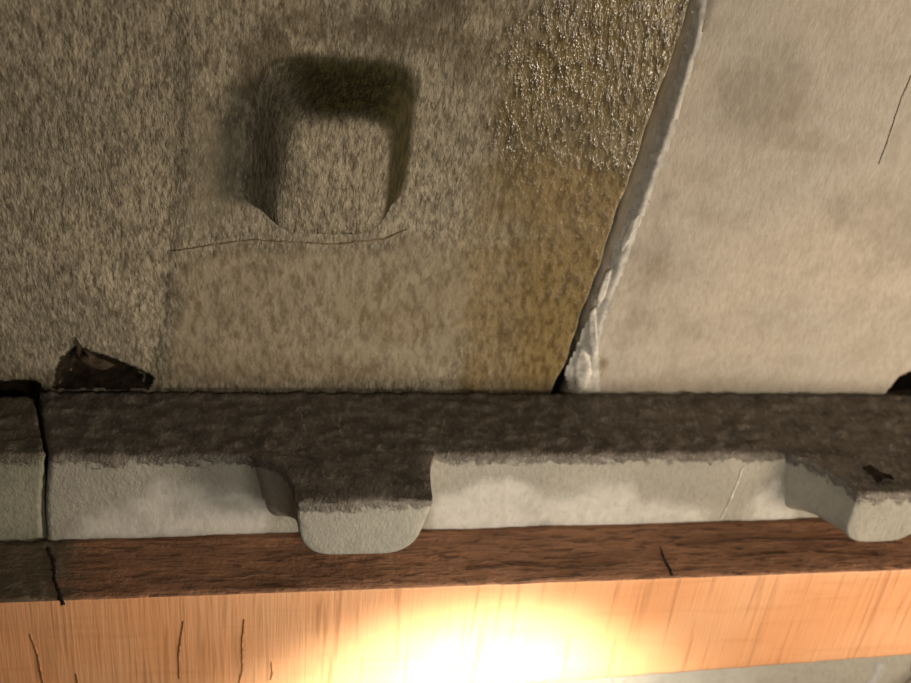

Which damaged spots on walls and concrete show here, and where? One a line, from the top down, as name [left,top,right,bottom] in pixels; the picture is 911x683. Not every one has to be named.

water stain [486,0,688,379]
spalling [0,338,155,422]
spalling [863,465,895,484]
crack [46,547,65,606]